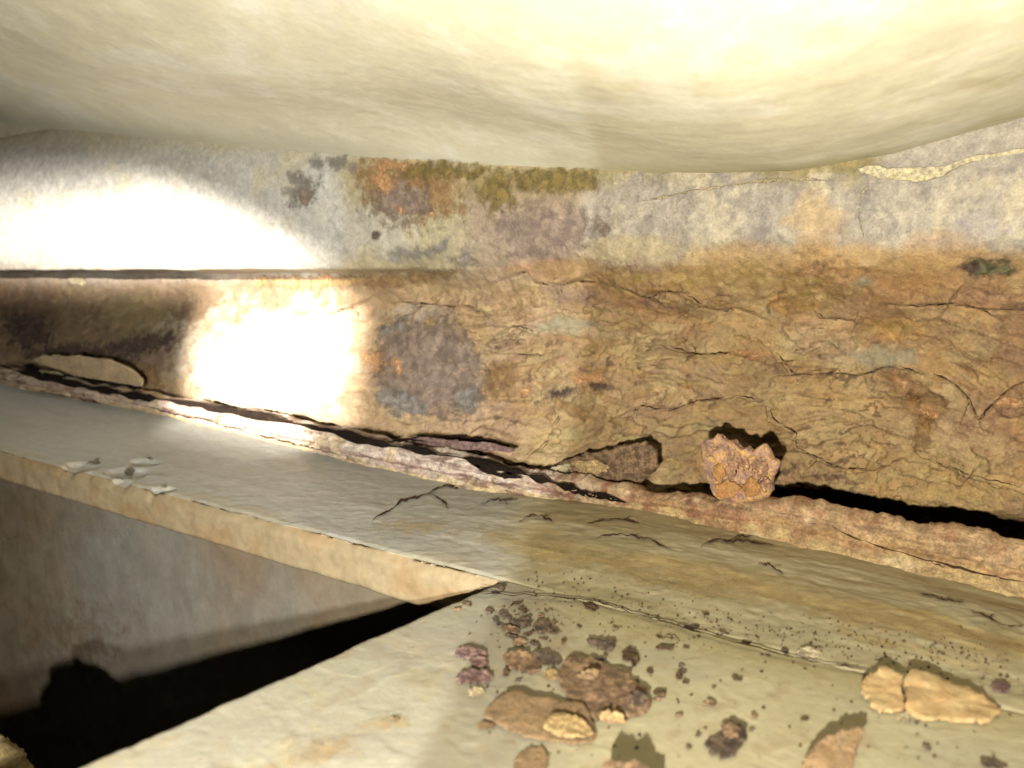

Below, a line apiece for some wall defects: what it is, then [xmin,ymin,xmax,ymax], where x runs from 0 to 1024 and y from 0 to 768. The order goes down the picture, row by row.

leakage [467,166,597,214]
leakage [962,258,1015,278]
crack [631,290,760,315]
crack [897,297,1023,316]
peeling [33,355,144,391]
crack [670,337,1023,420]
crack [0,361,667,548]
crack [635,395,894,470]
crack [932,458,1012,485]
peeling [485,601,567,647]